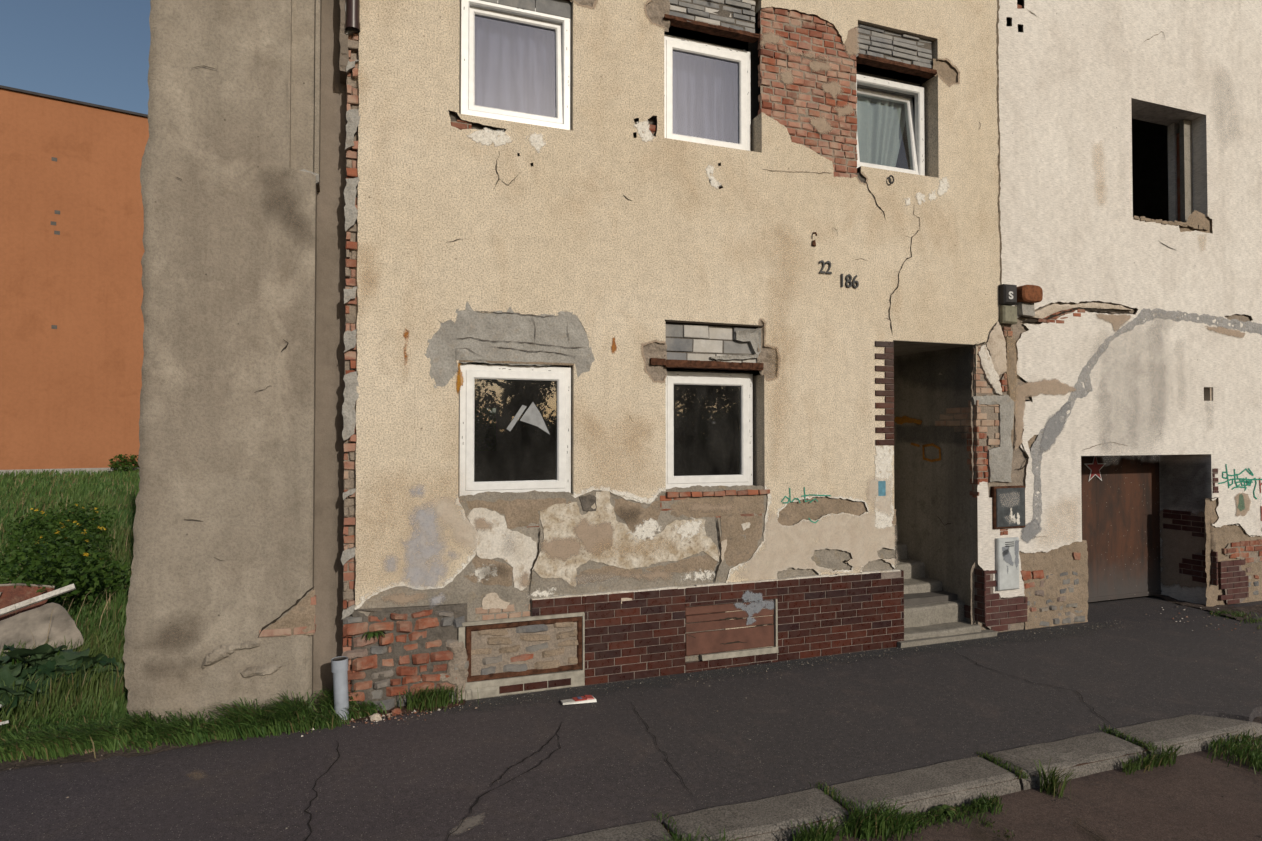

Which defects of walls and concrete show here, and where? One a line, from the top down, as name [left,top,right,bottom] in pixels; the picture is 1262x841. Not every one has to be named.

flaking render [570,0,598,9]
flaking render [449,111,506,132]
flaking render [633,117,656,138]
flaking render [757,1,868,184]
crack [866,182,920,336]
flaking render [1225,314,1251,322]
flaking render [971,318,1038,498]
flaking render [355,485,869,648]
flaking render [777,547,895,578]
flaking render [1205,498,1262,607]